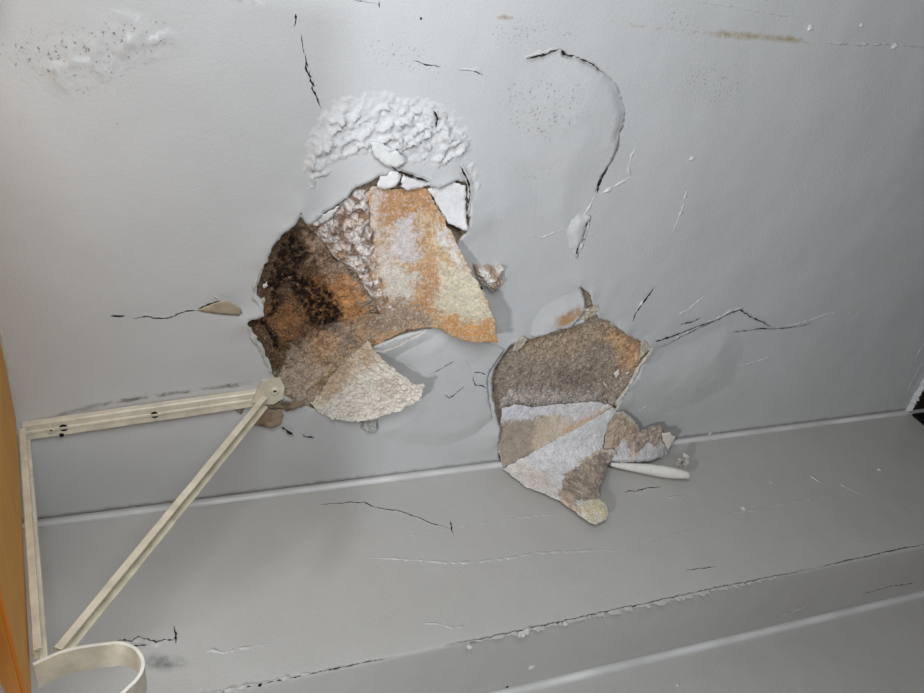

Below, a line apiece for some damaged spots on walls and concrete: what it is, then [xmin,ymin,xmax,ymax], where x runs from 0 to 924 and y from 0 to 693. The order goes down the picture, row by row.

crack [294,14,321,107]
crack [525,47,604,73]
crack [112,295,242,319]
spalling [246,171,504,438]
crack [656,307,887,345]
spalling [492,287,690,525]
crack [319,501,568,536]
crack [447,544,924,646]
crack [118,627,177,648]
crack [247,657,390,687]